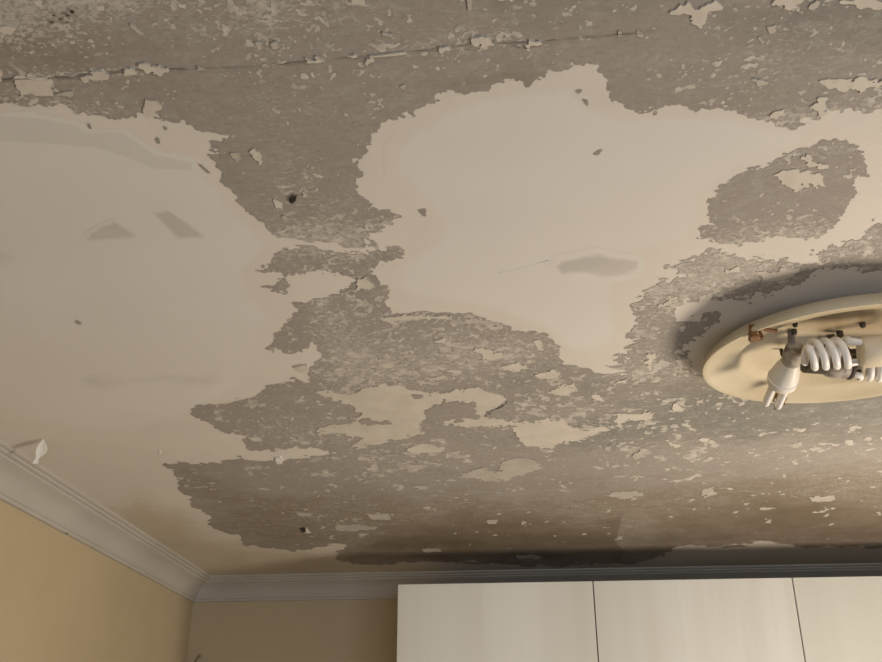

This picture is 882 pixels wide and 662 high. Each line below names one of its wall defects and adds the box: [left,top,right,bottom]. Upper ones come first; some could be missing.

crack [1,31,659,83]
peeling [0,0,882,252]
water stain [549,247,645,283]
peeling [162,223,882,552]
peeling [32,439,47,465]